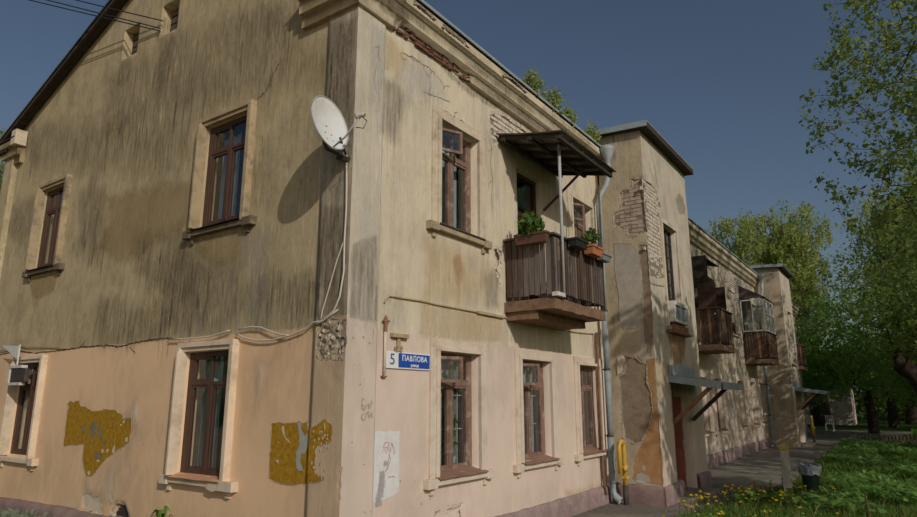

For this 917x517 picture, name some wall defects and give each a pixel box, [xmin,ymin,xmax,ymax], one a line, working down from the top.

flaking render [490,112,527,158]
crack [0,337,174,355]
flaking render [315,318,374,361]
flaking render [612,176,664,485]
peeling [63,401,132,477]
peeling [269,418,333,486]